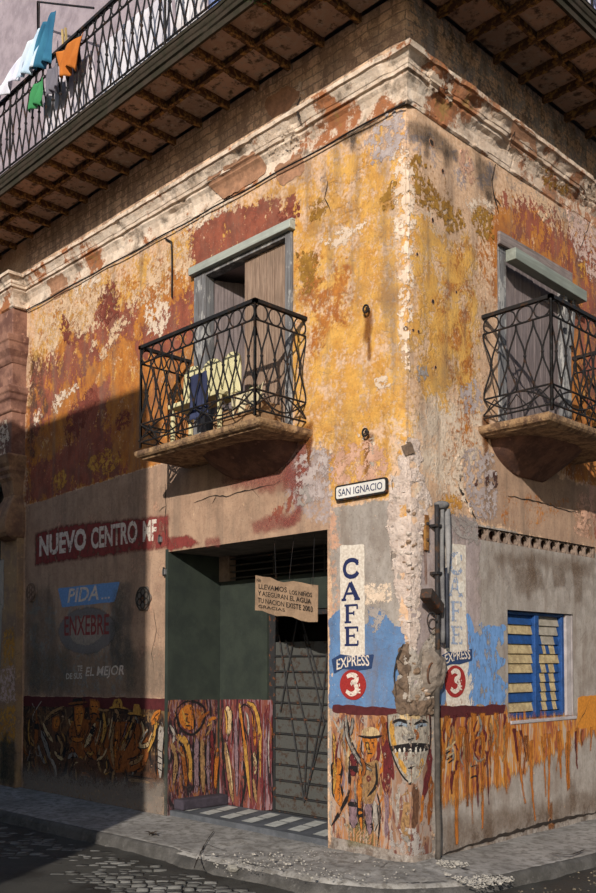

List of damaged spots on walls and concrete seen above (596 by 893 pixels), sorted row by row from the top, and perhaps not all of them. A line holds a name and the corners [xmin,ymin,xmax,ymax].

spalling [429,72,454,102]
crack [491,118,519,213]
spalling [33,125,305,360]
peeling [51,383,99,446]
crack [194,481,280,503]
crack [509,496,583,514]
spalling [293,434,500,716]